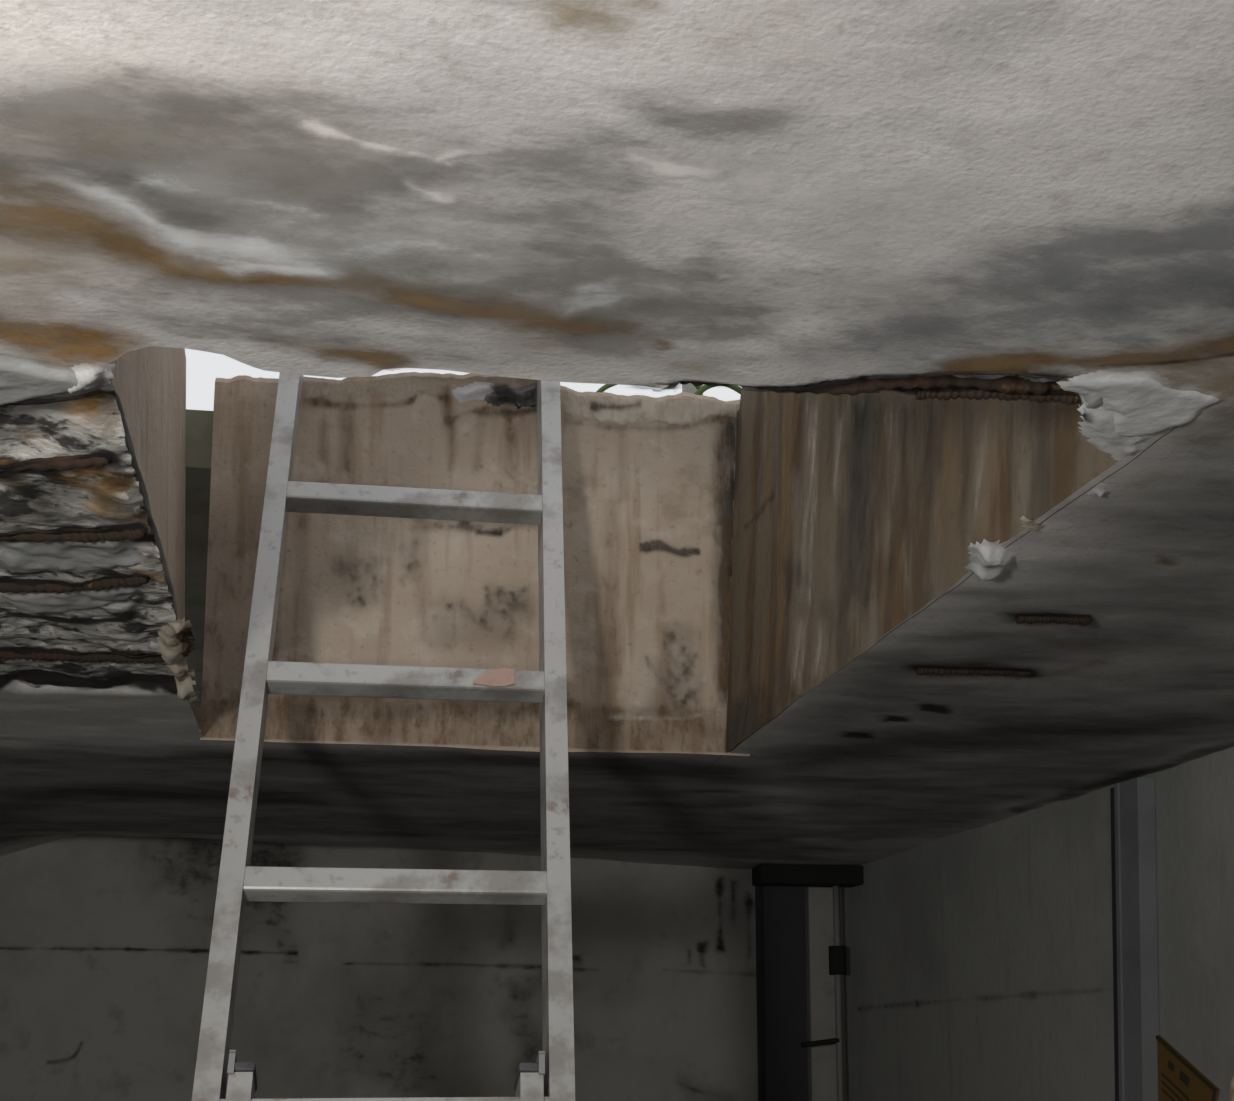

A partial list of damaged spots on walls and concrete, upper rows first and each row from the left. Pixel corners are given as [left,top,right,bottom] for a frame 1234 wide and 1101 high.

leakage [0,84,774,355]
leakage [959,207,1234,328]
peeling [564,370,1229,461]
leakage [850,315,986,367]
rust [944,335,1234,414]
spalling [0,380,199,703]
leakage [717,418,769,746]